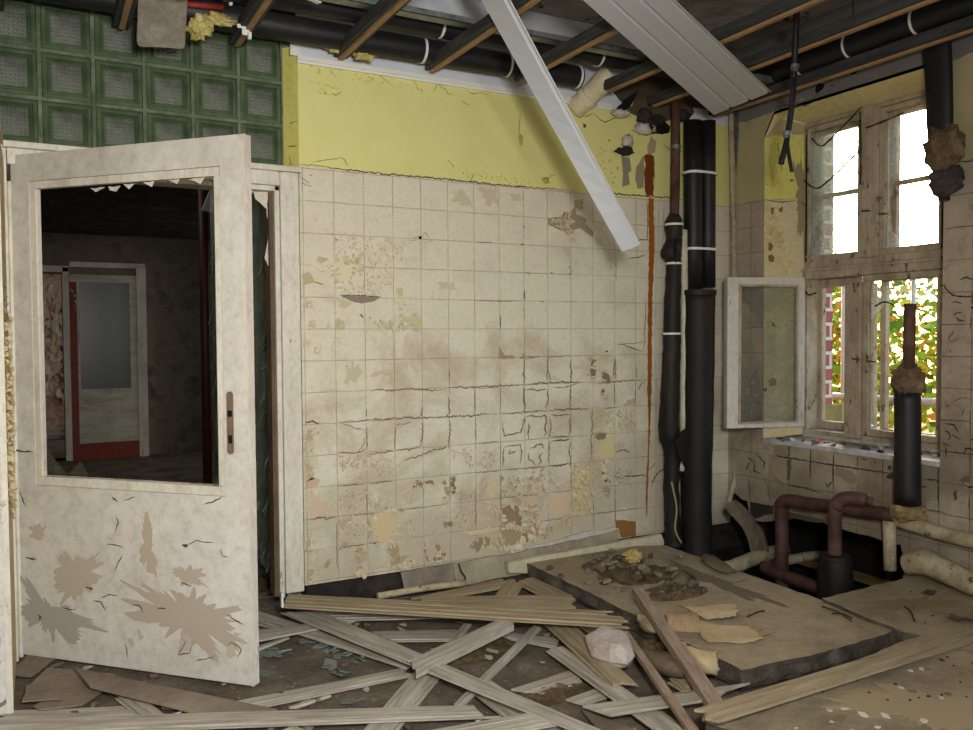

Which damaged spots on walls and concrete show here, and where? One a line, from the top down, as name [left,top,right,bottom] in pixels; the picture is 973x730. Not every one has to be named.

spalling [613,75,708,189]
spalling [548,200,604,247]
crack [479,267,572,326]
rust [644,154,655,516]
crack [941,276,972,357]
peeling [4,311,18,520]
crack [311,481,391,568]
spalling [412,475,458,496]
crack [338,306,664,527]
spalling [463,497,545,555]
rust [616,520,636,537]
crack [922,379,973,522]